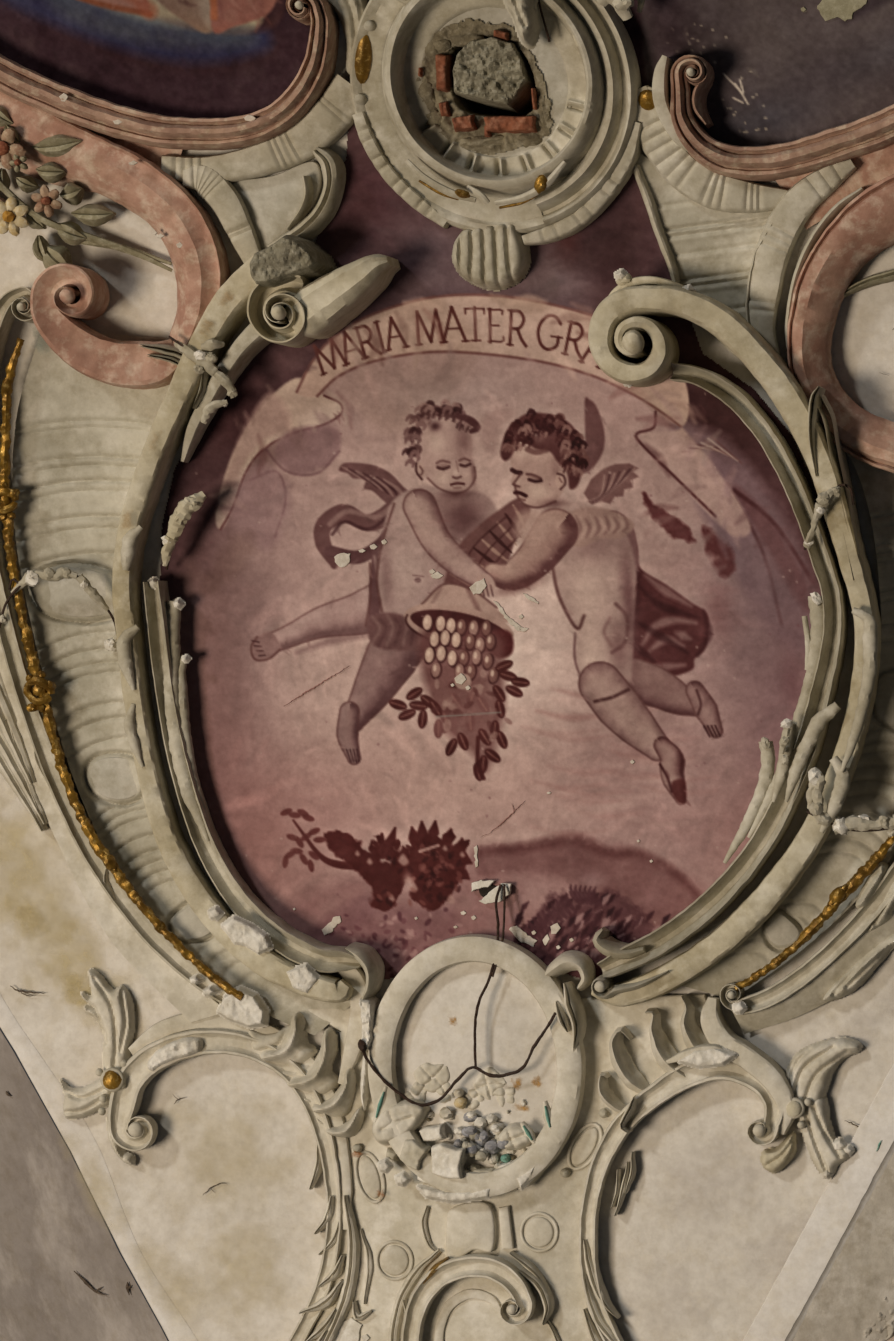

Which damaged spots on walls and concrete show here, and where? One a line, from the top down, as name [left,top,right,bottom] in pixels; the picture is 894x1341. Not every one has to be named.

peeling [801,0,867,22]
flaking render [416,18,553,155]
flaking render [453,845,512,928]
flaking render [207,905,274,955]
peeling [322,916,341,935]
peeling [509,923,574,949]
flaking render [189,973,270,1030]
flaking render [287,962,322,993]
flaking render [377,1088,532,1205]
flaking render [863,1279,894,1341]